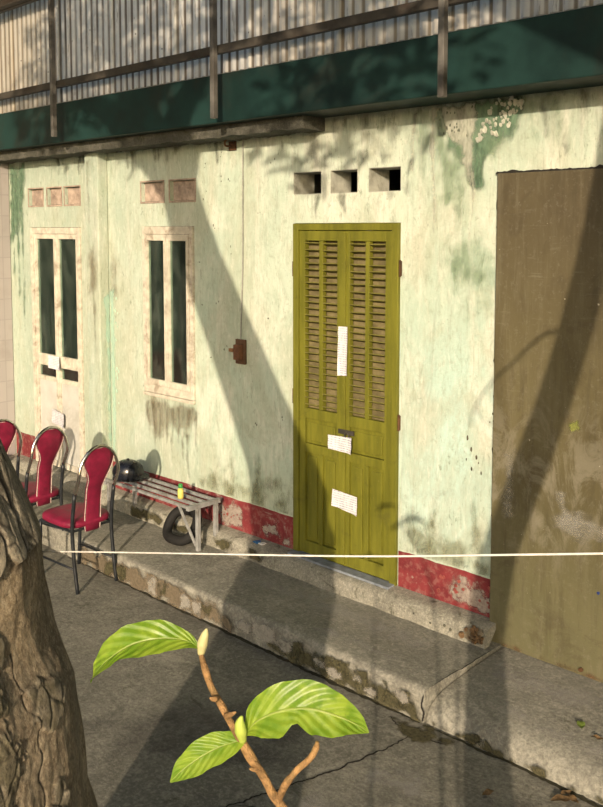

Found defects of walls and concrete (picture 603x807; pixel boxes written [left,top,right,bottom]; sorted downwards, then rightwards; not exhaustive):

damp [448,95,523,189]
damp [151,399,193,434]
peeling [218,504,242,526]
peeling [263,525,290,545]
peeling [437,574,490,614]
damp [313,652,367,689]
crack [226,652,488,807]